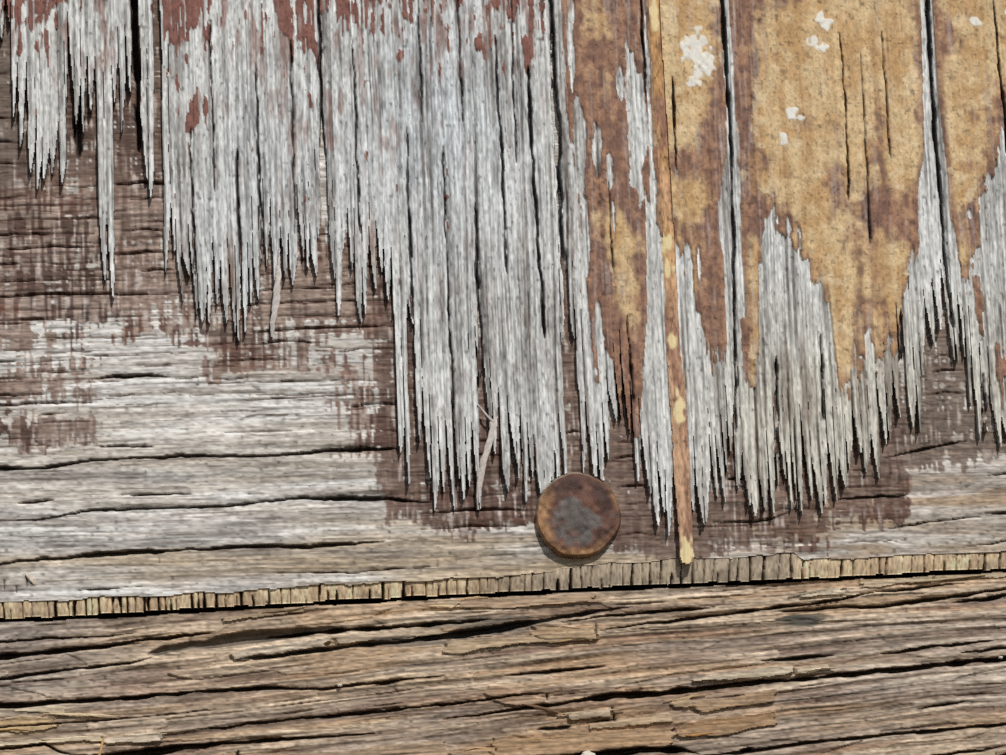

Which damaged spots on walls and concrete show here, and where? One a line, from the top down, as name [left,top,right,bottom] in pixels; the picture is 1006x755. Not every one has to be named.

peeling [162,0,212,58]
peeling [274,0,383,66]
peeling [475,0,546,73]
peeling [933,0,1006,337]
peeling [561,0,924,440]
crack [98,372,168,380]
crack [0,447,397,471]
crack [0,541,379,566]
crack [17,495,429,521]
corrosion [535,490,604,559]
crack [242,593,868,660]
crack [0,633,1006,755]